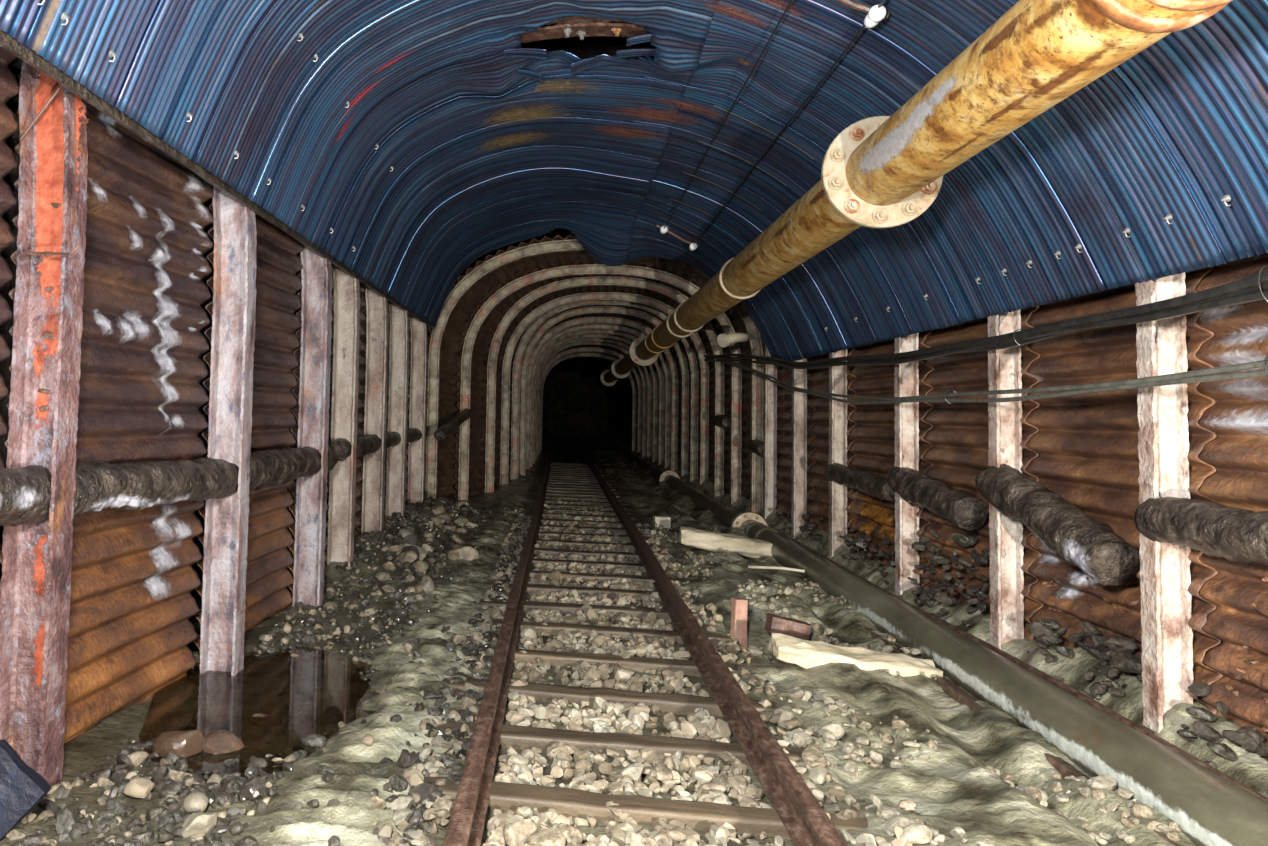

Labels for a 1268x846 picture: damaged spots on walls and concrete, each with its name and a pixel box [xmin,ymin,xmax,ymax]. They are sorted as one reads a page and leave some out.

rust [980,0,1118,54]
rust [944,45,1113,159]
efflorescence [187,176,207,279]
efflorescence [97,247,203,425]